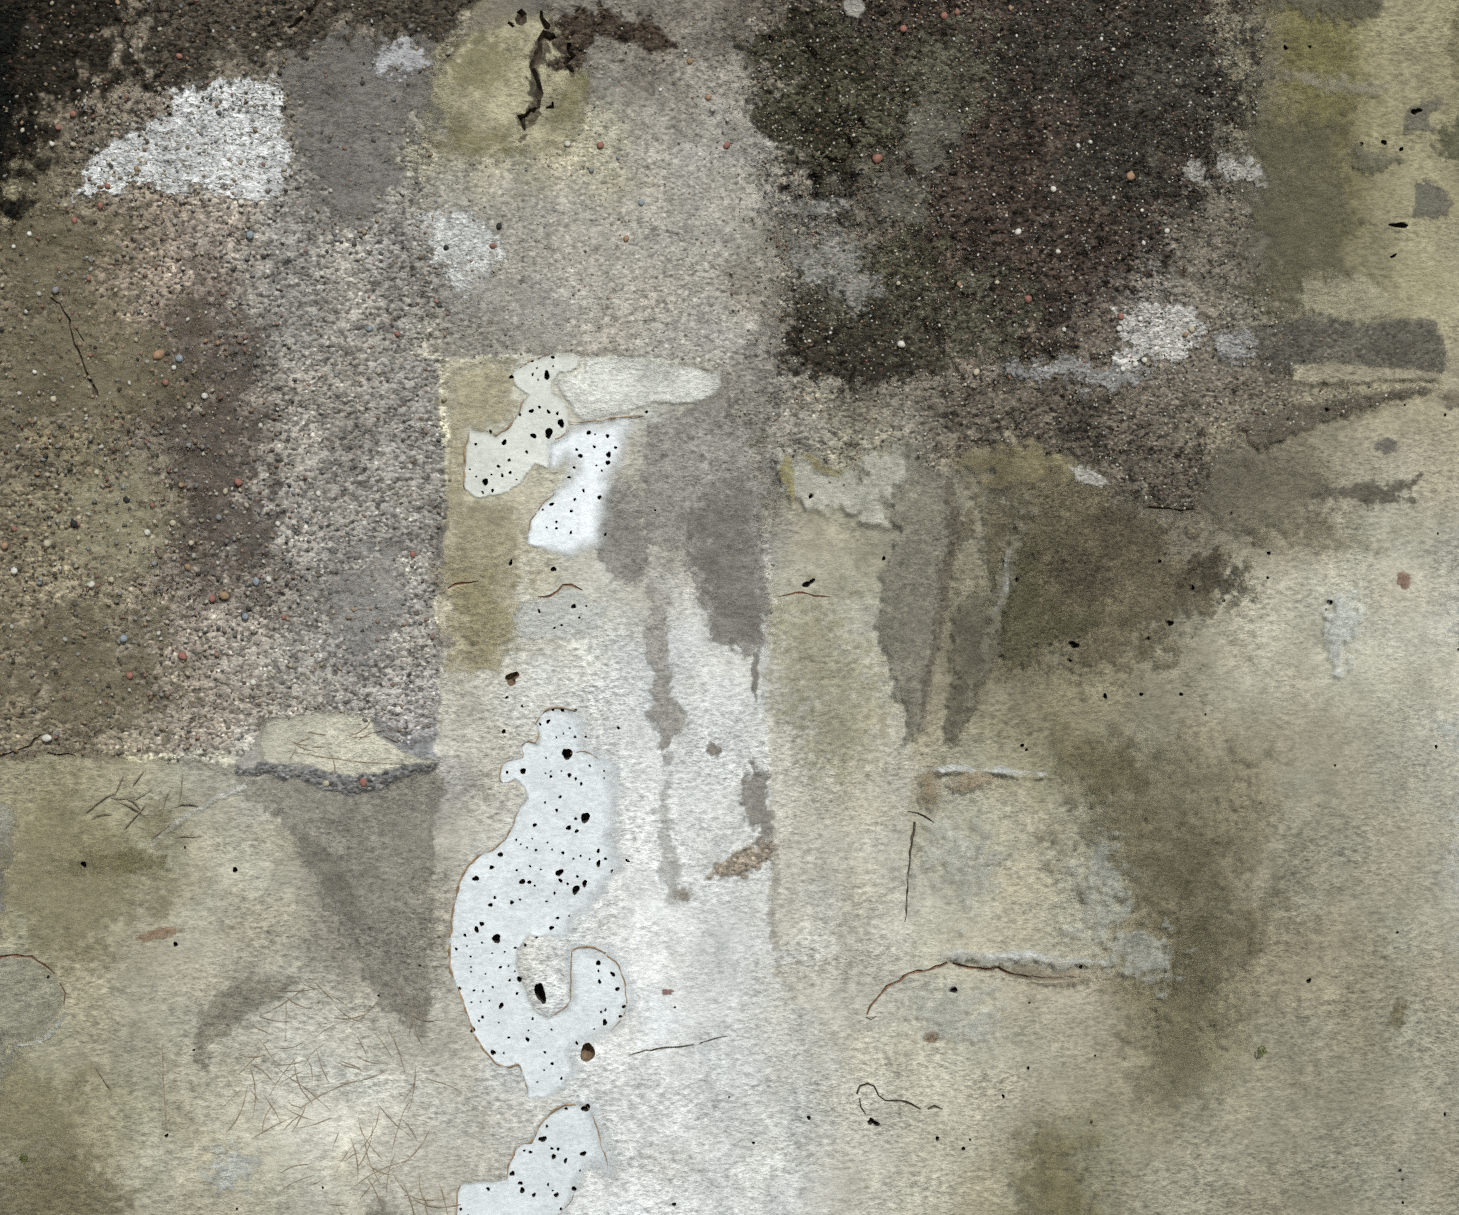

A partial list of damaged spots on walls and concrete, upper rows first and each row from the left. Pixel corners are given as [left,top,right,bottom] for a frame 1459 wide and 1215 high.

crack [507,8,587,142]
spalling [0,0,1425,796]
damp [735,0,1459,746]
damp [596,400,771,748]
damp [706,742,722,756]
damp [922,764,1046,776]
peeling [448,706,632,1215]
crack [866,961,1072,1020]